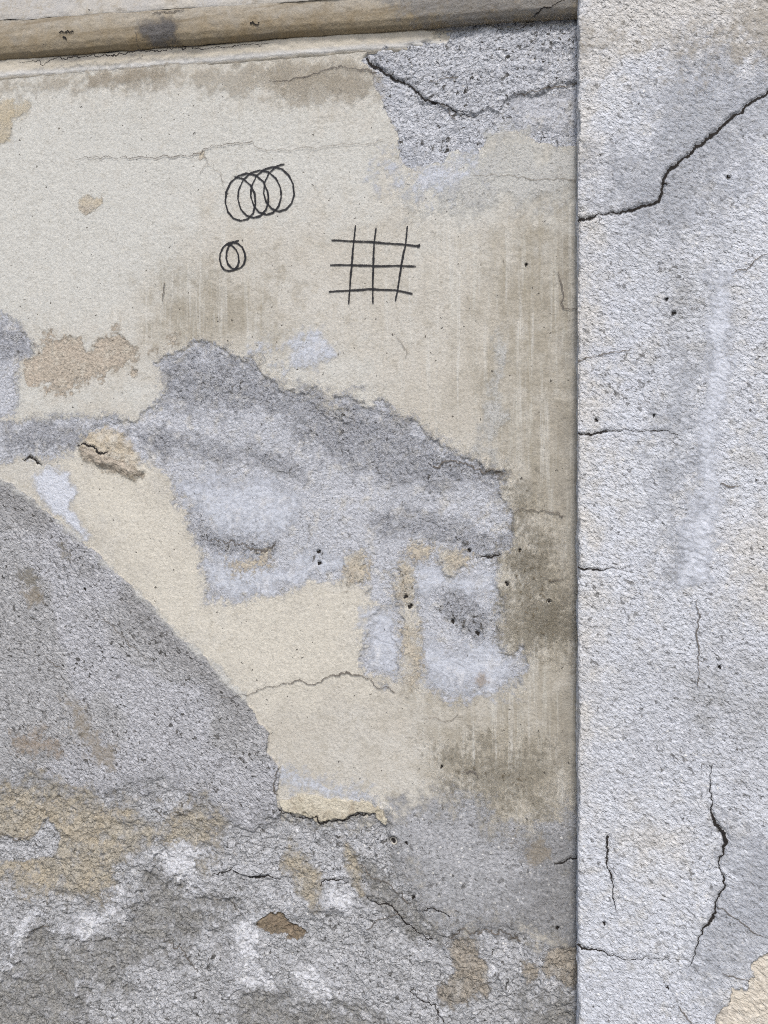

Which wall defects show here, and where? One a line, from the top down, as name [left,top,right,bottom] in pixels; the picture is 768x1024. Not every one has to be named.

flaking render [362,19,578,210]
crack [577,91,768,222]
crack [578,428,678,436]
peeling [0,310,531,707]
crack [220,671,395,698]
crack [577,766,764,967]
peeling [715,954,768,1024]